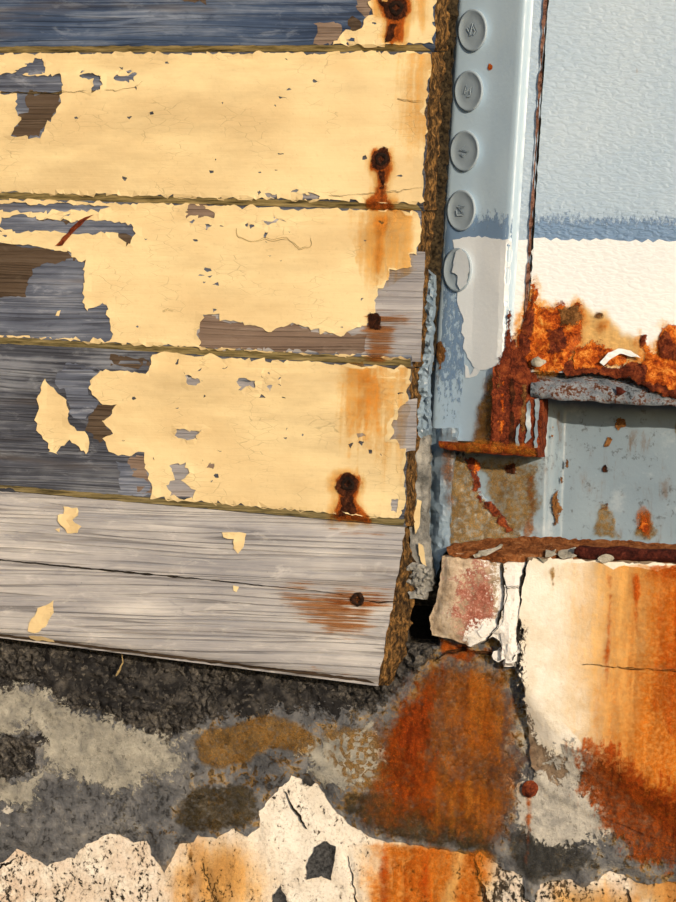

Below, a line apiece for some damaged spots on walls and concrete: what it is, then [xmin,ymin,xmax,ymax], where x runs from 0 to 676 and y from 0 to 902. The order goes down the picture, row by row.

peeling [0,0,379,45]
corrosion [378,0,410,42]
peeling [196,251,425,362]
peeling [0,242,155,497]
corrosion [481,279,676,450]
corrosion [335,472,369,521]
corrosion [574,545,676,563]
crack [584,664,676,672]
spalling [0,553,676,902]
crack [284,791,307,829]
crack [203,862,218,902]
crack [474,858,490,902]